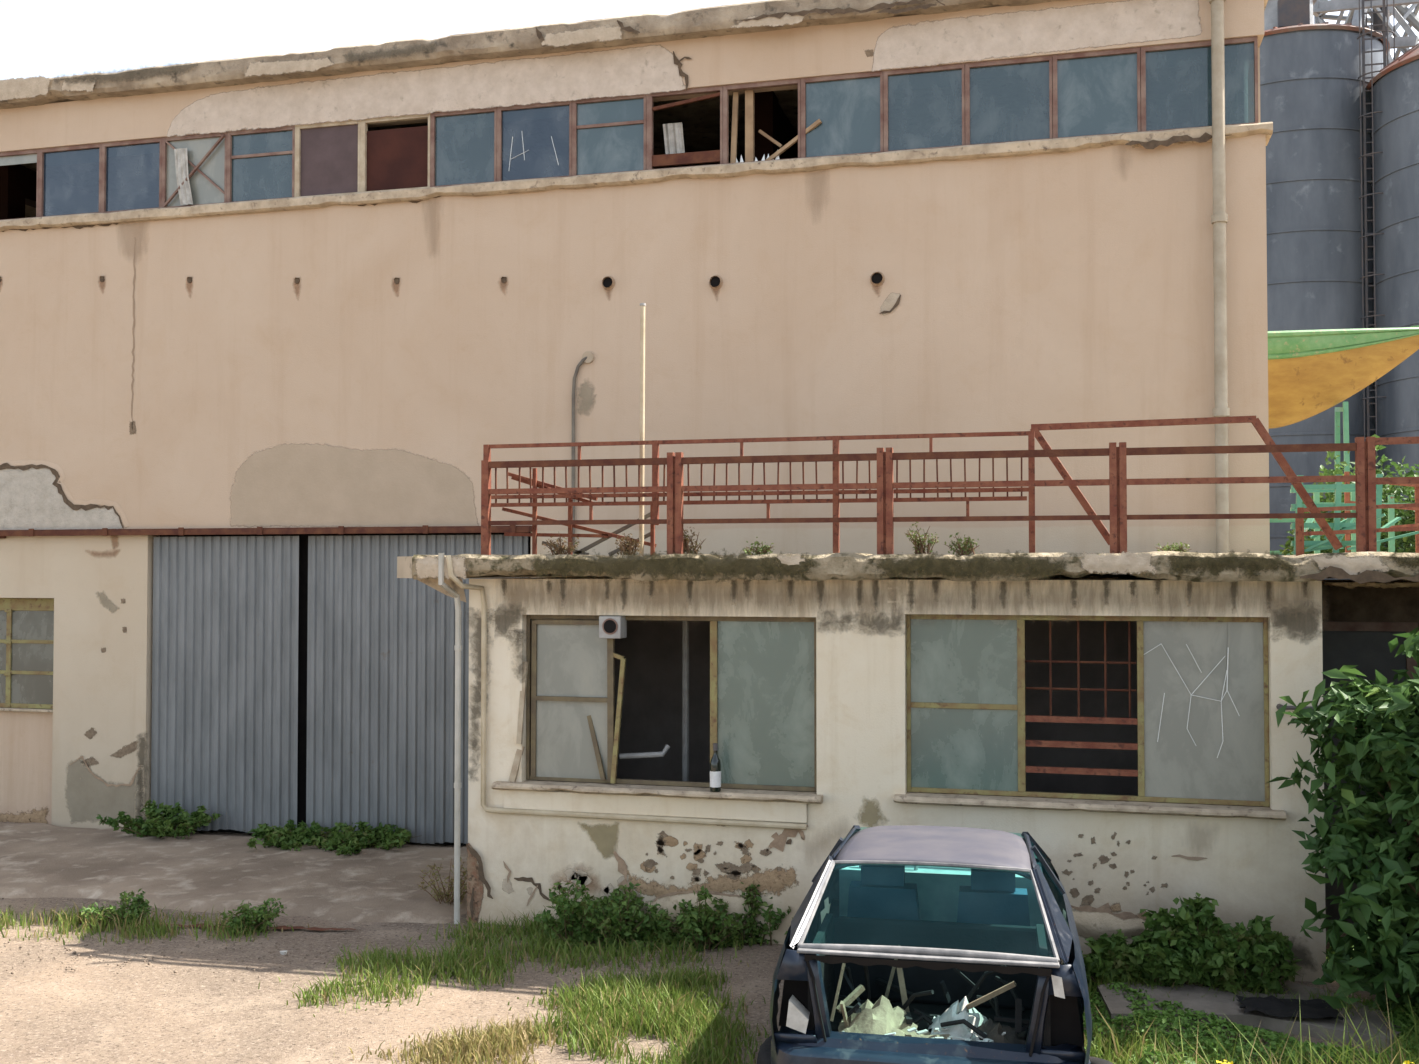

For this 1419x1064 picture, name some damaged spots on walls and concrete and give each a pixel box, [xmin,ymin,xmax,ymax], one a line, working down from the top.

peeling [0,460,130,530]
water stain [822,581,900,633]
water stain [1267,582,1318,640]
spalling [0,808,48,823]
peeling [66,742,142,821]
spalling [466,843,533,923]
peeling [556,825,798,905]
peeling [1062,832,1168,907]